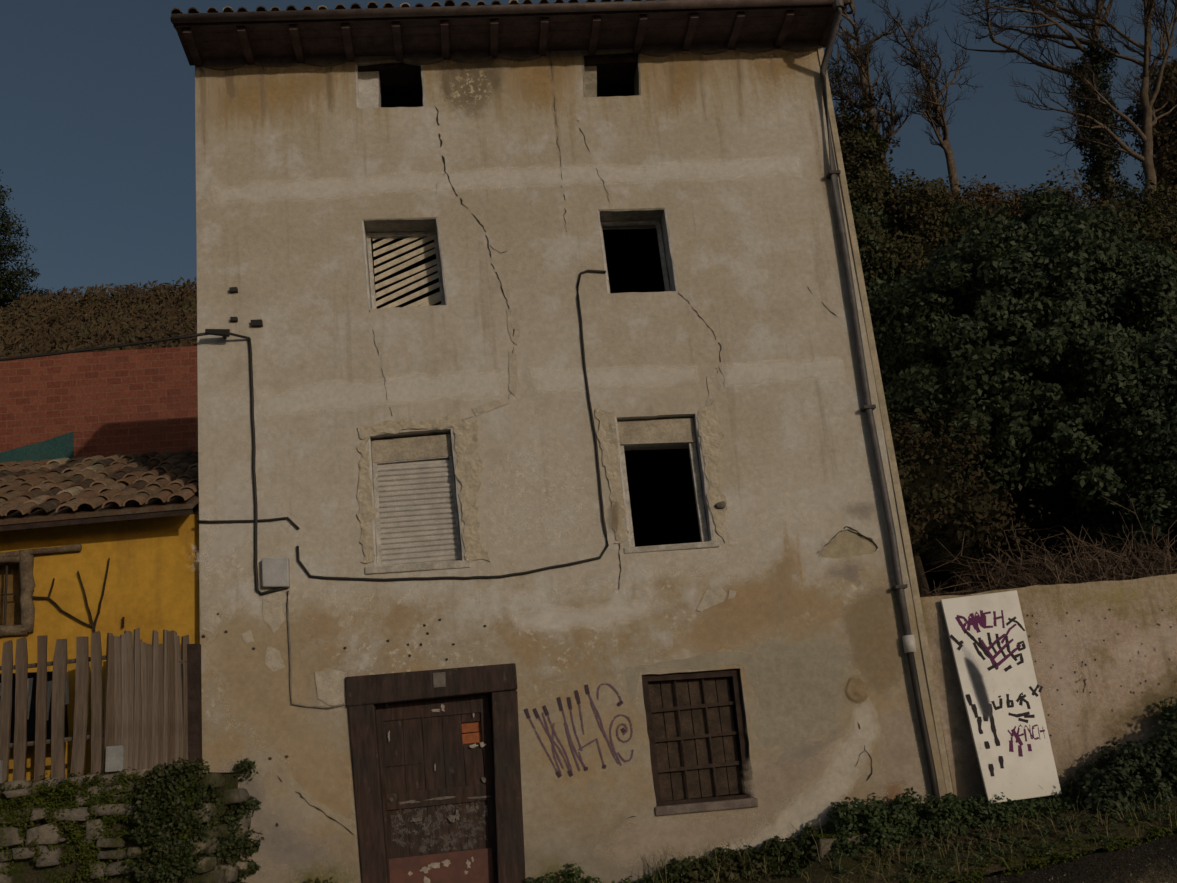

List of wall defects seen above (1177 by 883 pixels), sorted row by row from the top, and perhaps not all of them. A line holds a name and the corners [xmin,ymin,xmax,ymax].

damp [201,67,337,124]
damp [441,54,565,113]
damp [662,52,705,113]
crack [551,62,610,232]
crack [435,106,520,419]
crack [678,292,725,405]
flaking render [817,526,877,558]
damp [845,587,904,694]
damp [238,773,326,872]